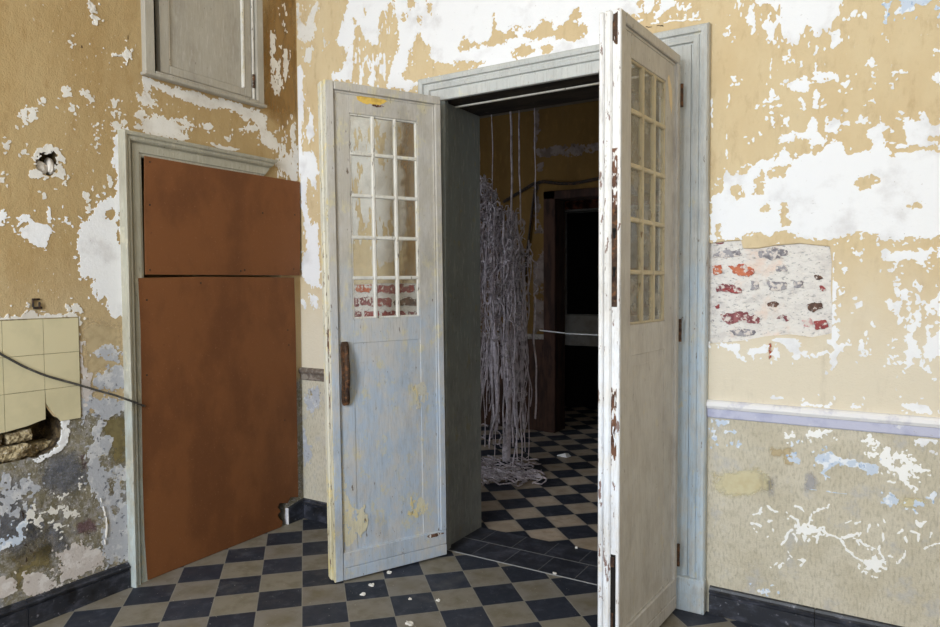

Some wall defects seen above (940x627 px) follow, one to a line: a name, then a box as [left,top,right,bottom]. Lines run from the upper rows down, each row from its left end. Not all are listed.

peeling [708,0,940,381]
peeling [0,0,701,598]
peeling [708,419,742,449]
peeling [784,429,938,515]
peeling [899,396,940,415]